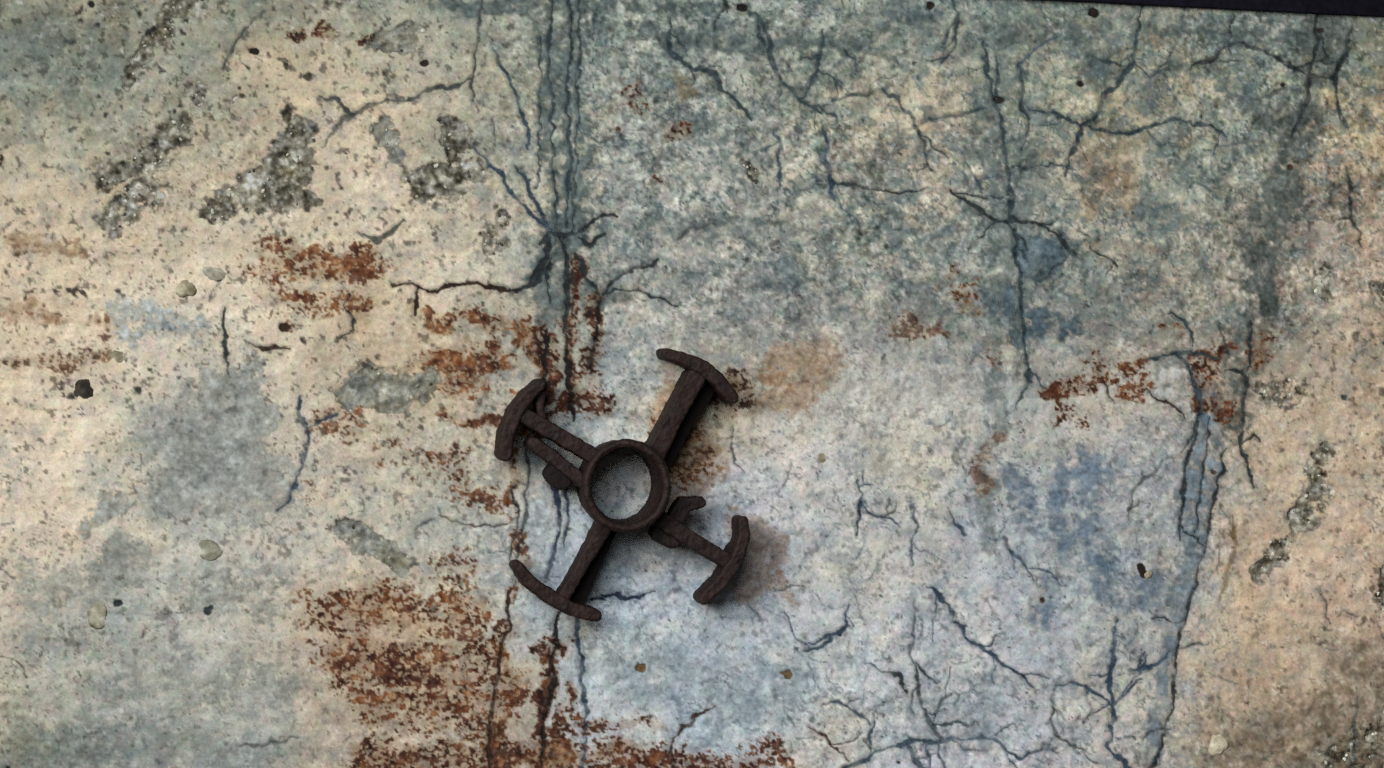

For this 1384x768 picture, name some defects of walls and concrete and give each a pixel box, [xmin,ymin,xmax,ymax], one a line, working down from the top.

spalling [91,81,207,241]
spalling [122,0,208,92]
spalling [199,96,323,224]
corrosion [239,236,392,332]
spalling [368,114,485,204]
crack [666,20,782,190]
crack [714,0,1353,406]
corrosion [373,254,619,559]
crack [319,0,715,768]
corrosion [1037,350,1154,429]
crack [808,312,1261,768]
corrosion [292,546,795,768]